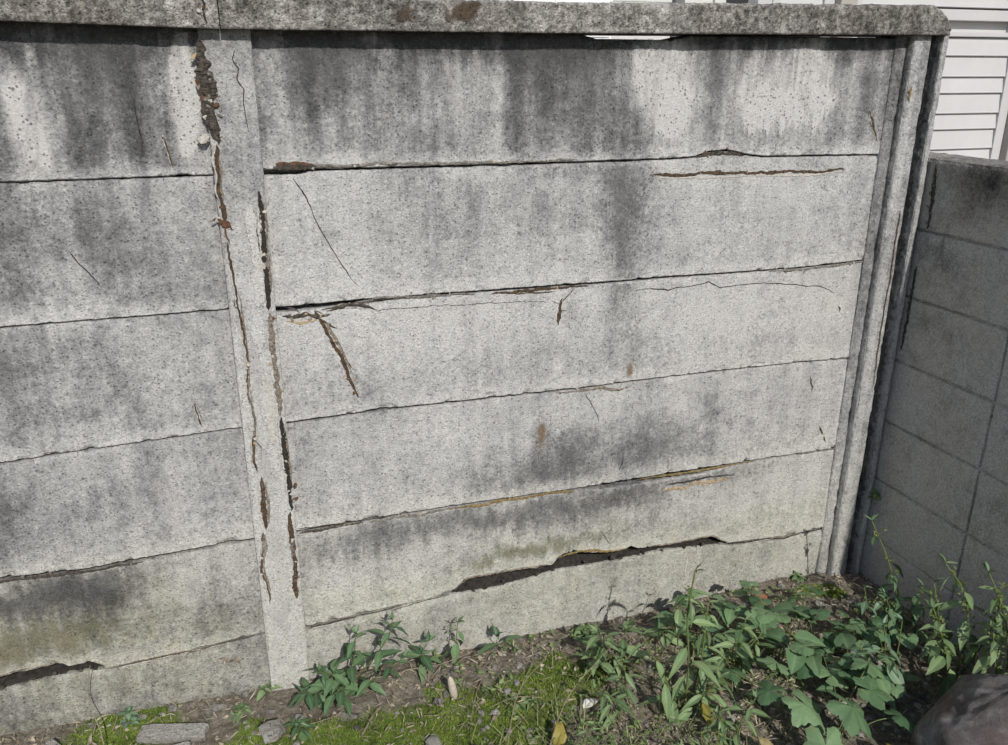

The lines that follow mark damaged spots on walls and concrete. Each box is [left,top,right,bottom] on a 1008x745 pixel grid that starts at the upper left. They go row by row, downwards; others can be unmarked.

damp [0,72,54,177]
damp [168,33,203,165]
crack [232,50,249,131]
damp [630,42,697,145]
crack [653,168,844,180]
damp [733,45,840,137]
crack [293,178,547,398]
crack [211,144,386,602]